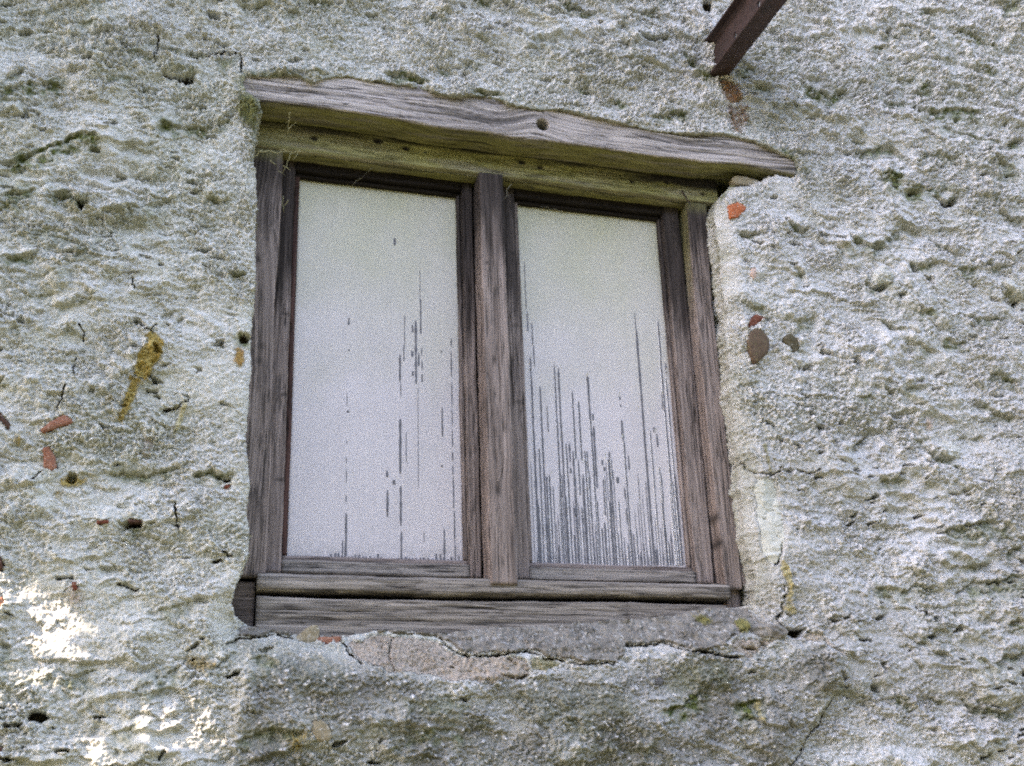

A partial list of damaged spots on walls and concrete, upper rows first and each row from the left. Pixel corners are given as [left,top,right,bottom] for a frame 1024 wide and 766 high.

rust [720,78,748,133]
spalling [348,633,560,684]
crack [444,643,737,666]